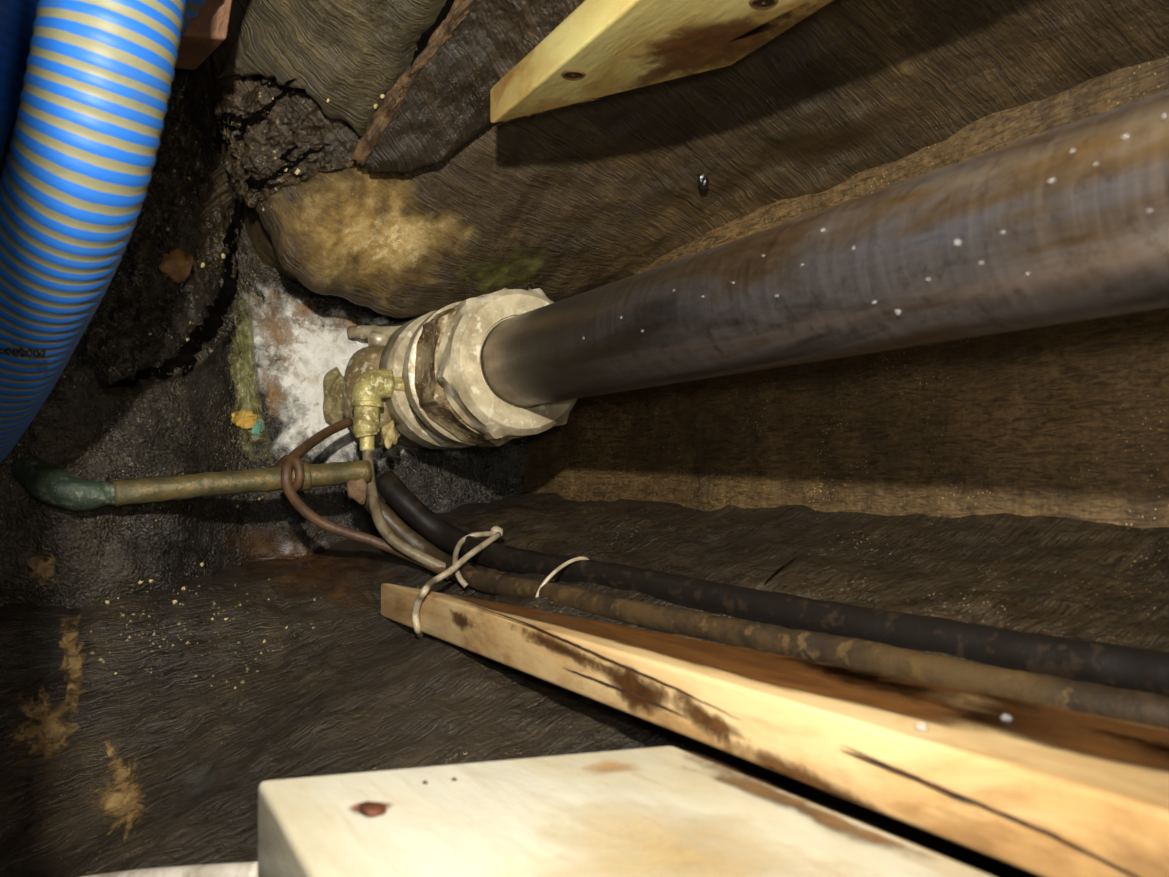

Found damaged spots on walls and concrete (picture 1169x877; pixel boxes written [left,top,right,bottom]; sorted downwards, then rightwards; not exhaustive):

crack [212,74,311,154]
crack [105,120,353,388]
damp [368,218,421,260]
damp [249,291,393,463]